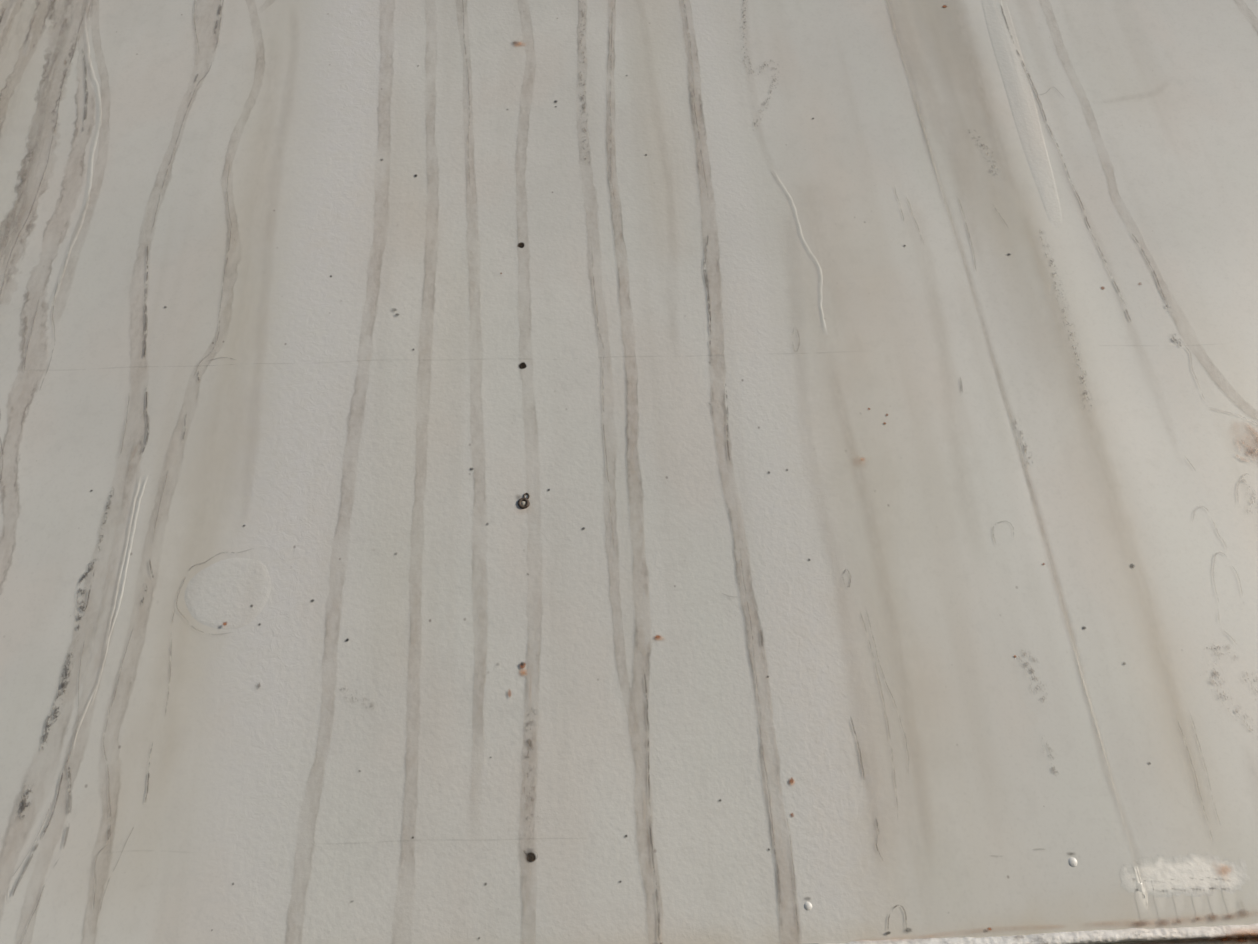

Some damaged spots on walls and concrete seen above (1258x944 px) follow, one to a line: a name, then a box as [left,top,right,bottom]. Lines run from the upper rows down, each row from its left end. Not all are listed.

leakage [69,475,149,756]
rust [1172,933,1258,943]